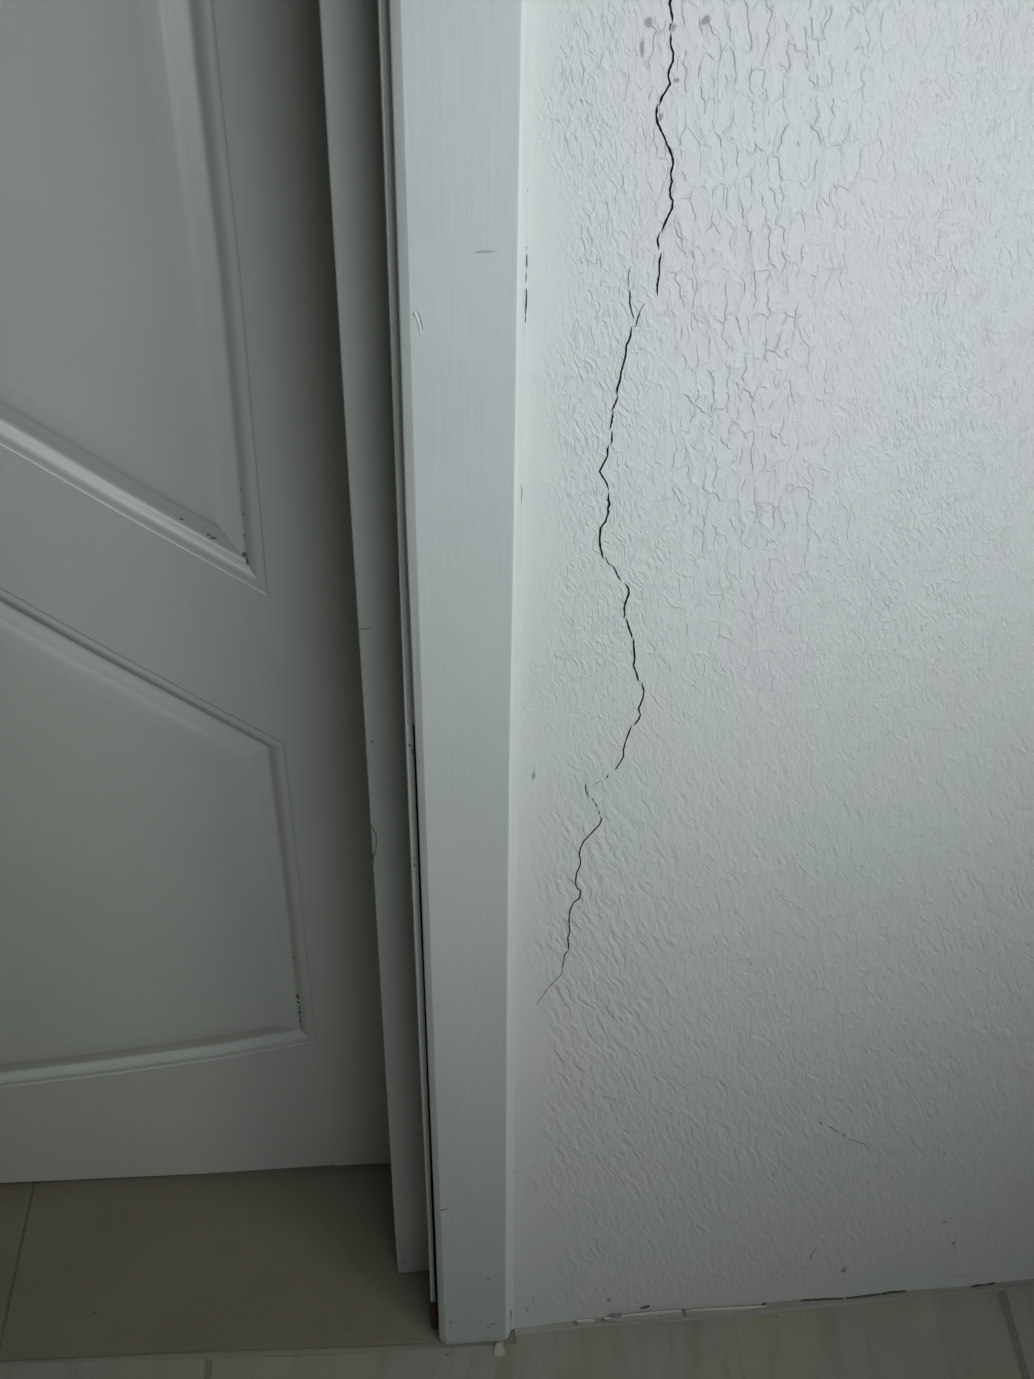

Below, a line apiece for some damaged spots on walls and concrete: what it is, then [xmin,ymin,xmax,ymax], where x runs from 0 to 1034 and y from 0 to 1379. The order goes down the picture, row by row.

crack [536,0,675,1004]